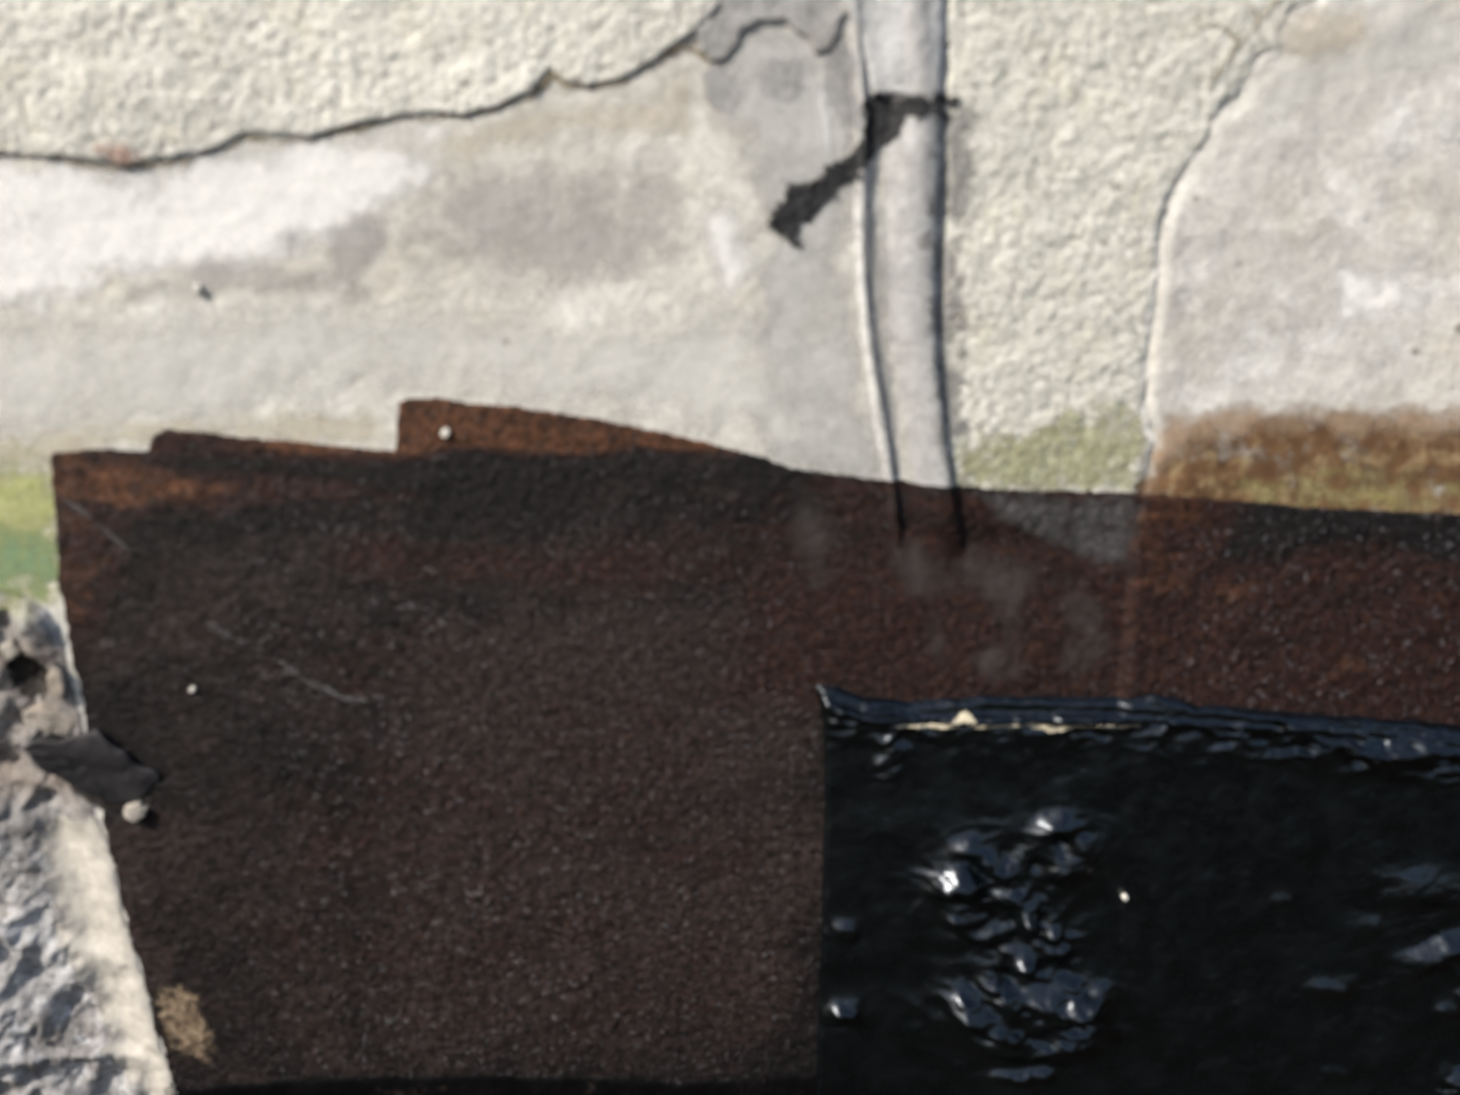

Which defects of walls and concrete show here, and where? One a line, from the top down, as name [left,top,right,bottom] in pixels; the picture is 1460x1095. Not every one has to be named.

crack [0,38,710,176]